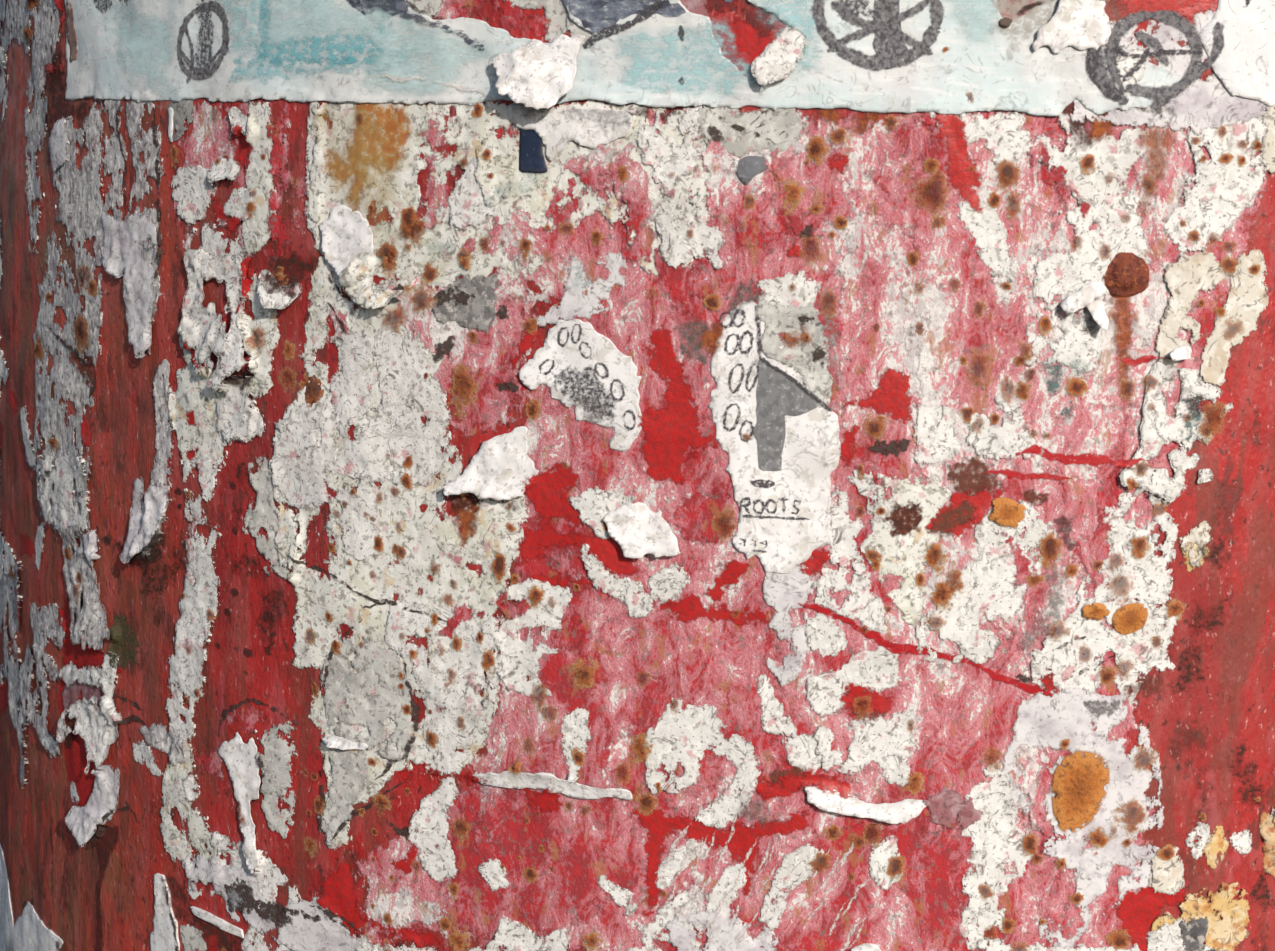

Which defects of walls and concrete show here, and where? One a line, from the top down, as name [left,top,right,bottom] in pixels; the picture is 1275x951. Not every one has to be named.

corrosion [327,103,410,218]
corrosion [376,206,424,277]
corrosion [988,159,1020,219]
peeling [0,0,319,951]
peeling [482,486,644,697]
corrosion [916,544,964,629]
corrosion [1083,536,1151,635]
peeling [408,774,511,891]
peeling [602,698,761,829]
peeling [755,675,920,787]
corrosion [1052,739,1146,848]
peeling [1146,745,1275,951]